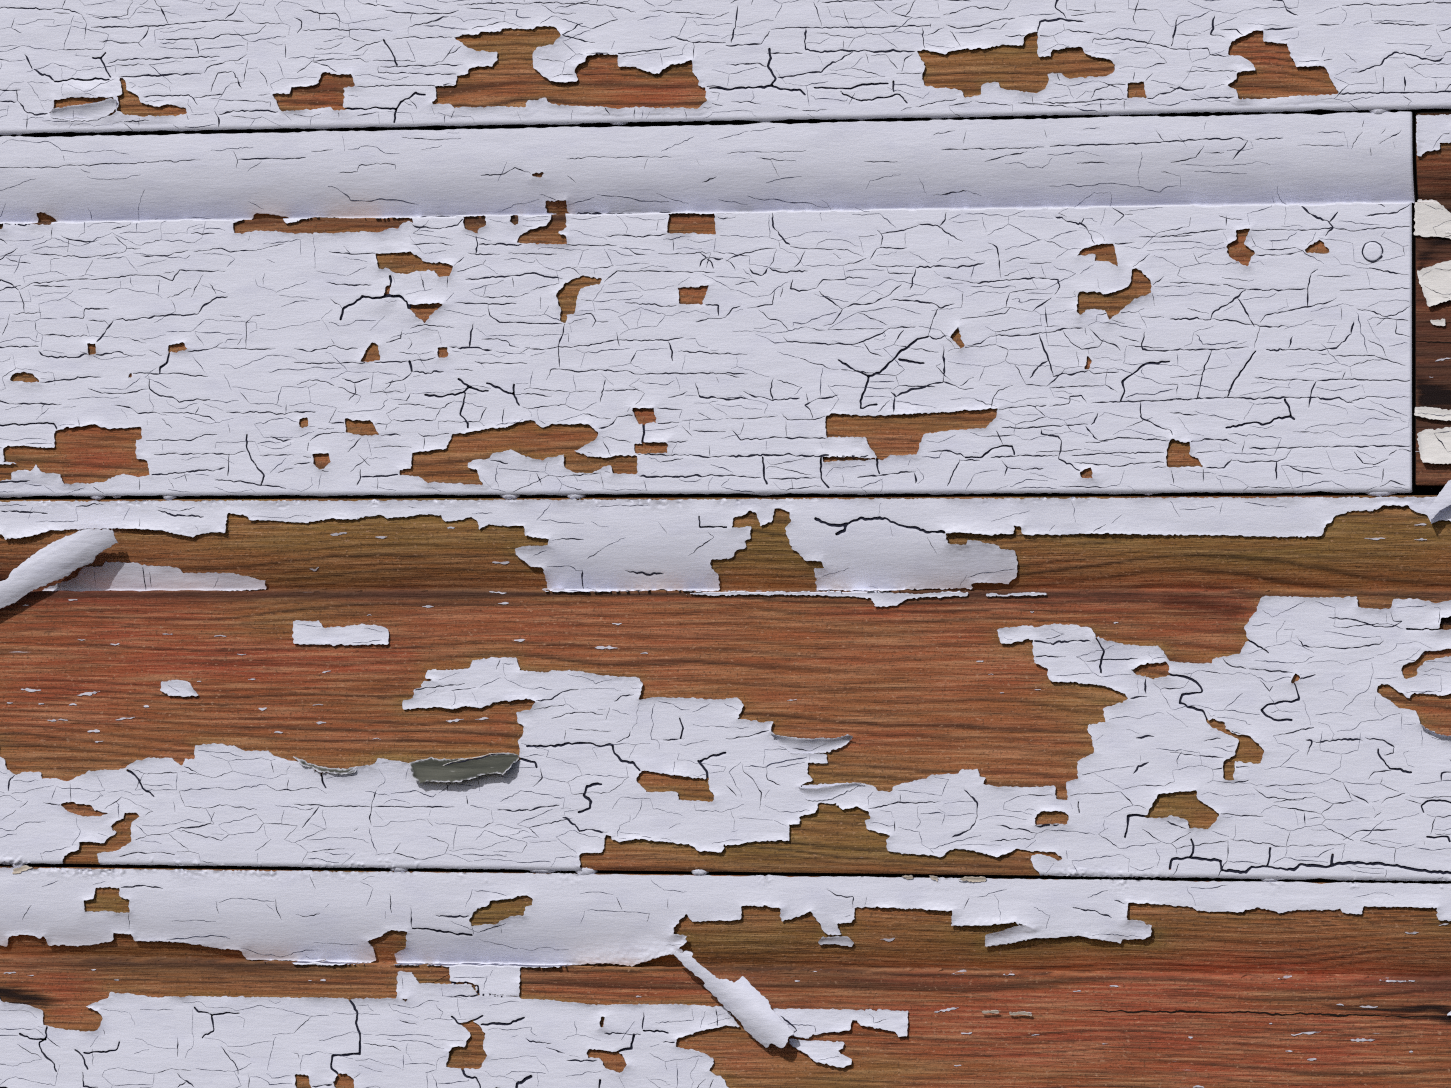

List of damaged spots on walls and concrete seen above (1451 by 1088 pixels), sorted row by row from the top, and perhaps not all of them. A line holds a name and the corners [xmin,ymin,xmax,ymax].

peeling [273,72,355,112]
peeling [433,26,710,109]
peeling [917,32,1115,98]
peeling [1228,30,1339,99]
crack [0,0,1451,590]
peeling [0,113,1451,880]
crack [868,601,1451,937]
peeling [84,887,130,913]
crack [0,661,822,1088]
peeling [469,895,533,926]
peeling [0,902,1451,1088]
crack [781,1016,836,1060]